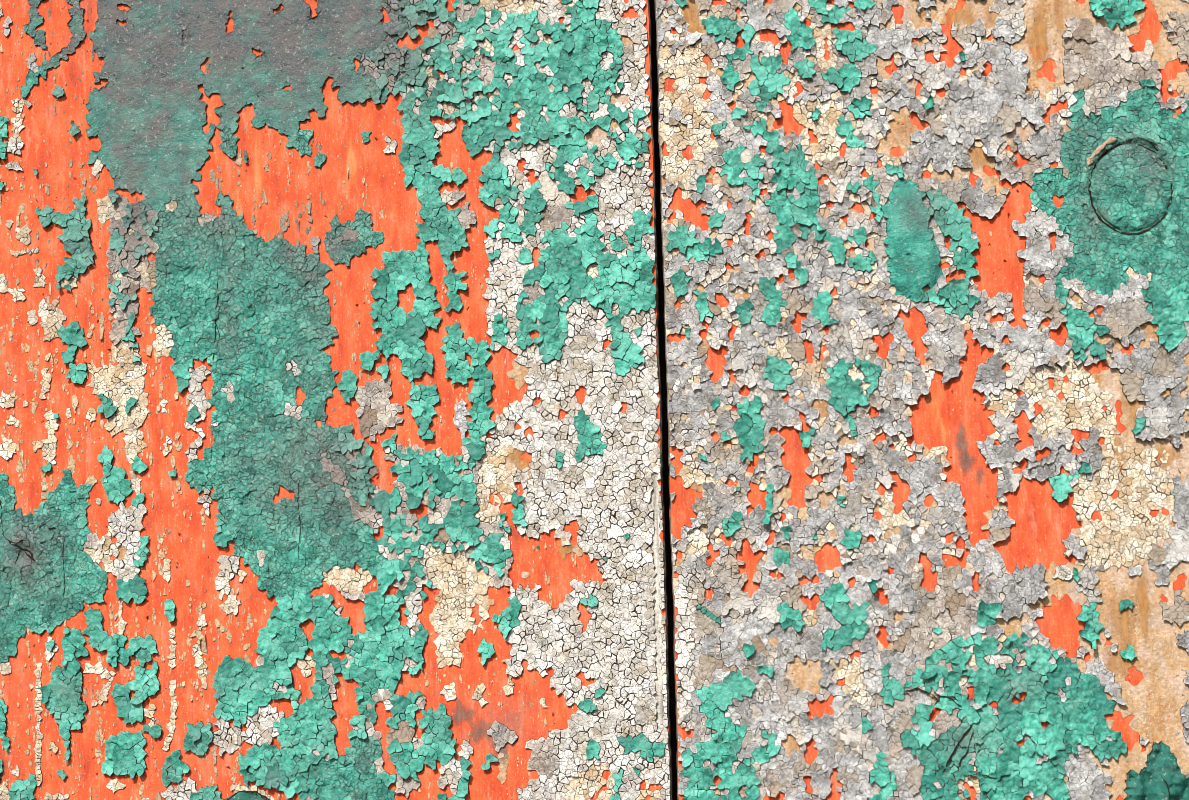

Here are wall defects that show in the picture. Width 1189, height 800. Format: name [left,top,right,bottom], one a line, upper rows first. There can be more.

peeling [0,0,670,800]
peeling [656,0,1189,800]